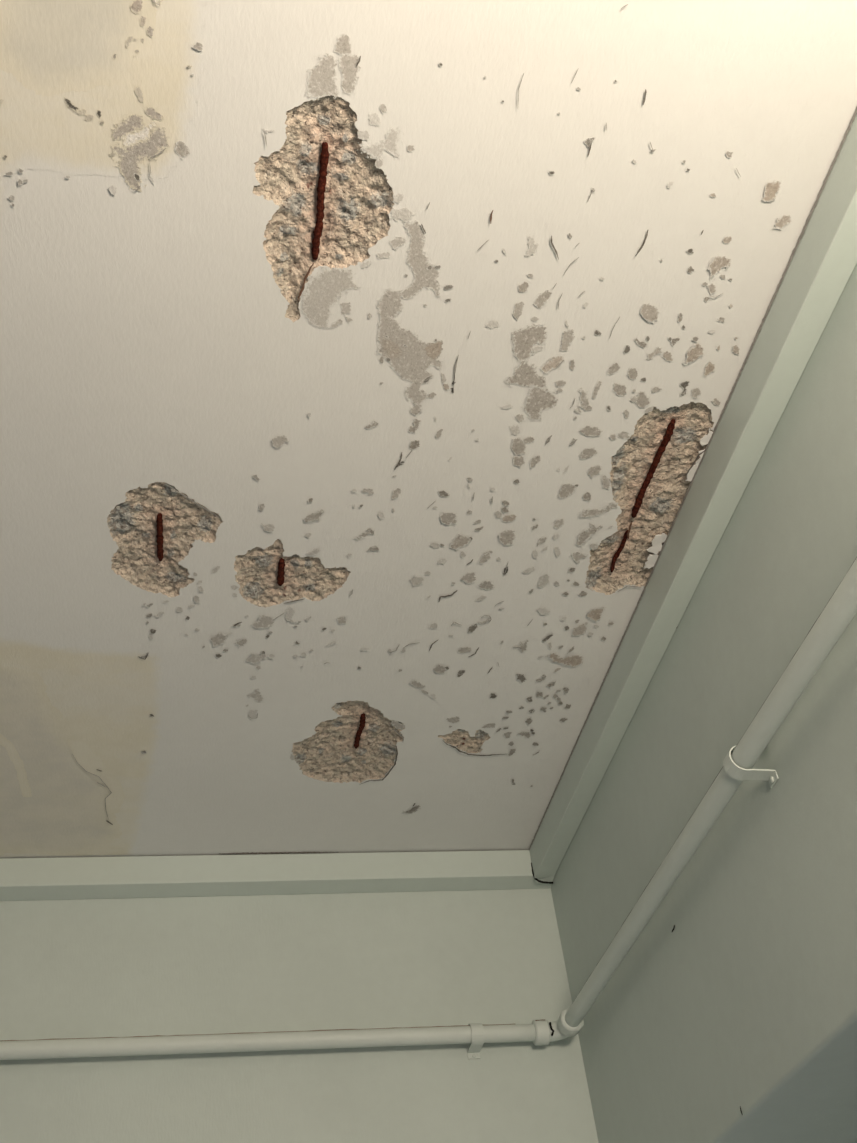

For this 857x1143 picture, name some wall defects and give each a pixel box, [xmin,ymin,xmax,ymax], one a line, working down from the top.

peeling [4,155,28,207]
water stain [0,0,206,224]
peeling [64,87,191,195]
spalling [253,34,459,551]
water stain [0,636,165,857]
spalling [107,482,353,719]
spalling [290,701,406,784]
peeling [433,664,466,677]
peeling [388,477,517,657]
spalling [438,233,740,756]